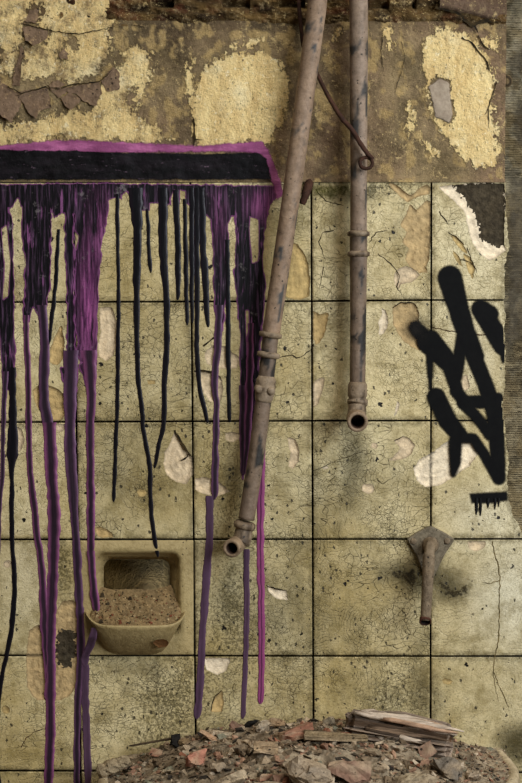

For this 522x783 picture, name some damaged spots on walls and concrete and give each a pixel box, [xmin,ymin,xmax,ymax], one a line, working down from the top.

flaking render [0,0,176,146]
flaking render [183,36,292,154]
flaking render [403,25,506,172]
crack [370,230,418,308]
spalling [389,182,507,289]
spalling [163,433,230,496]
spalling [389,436,478,487]
spalling [26,600,77,701]
crack [483,541,508,706]